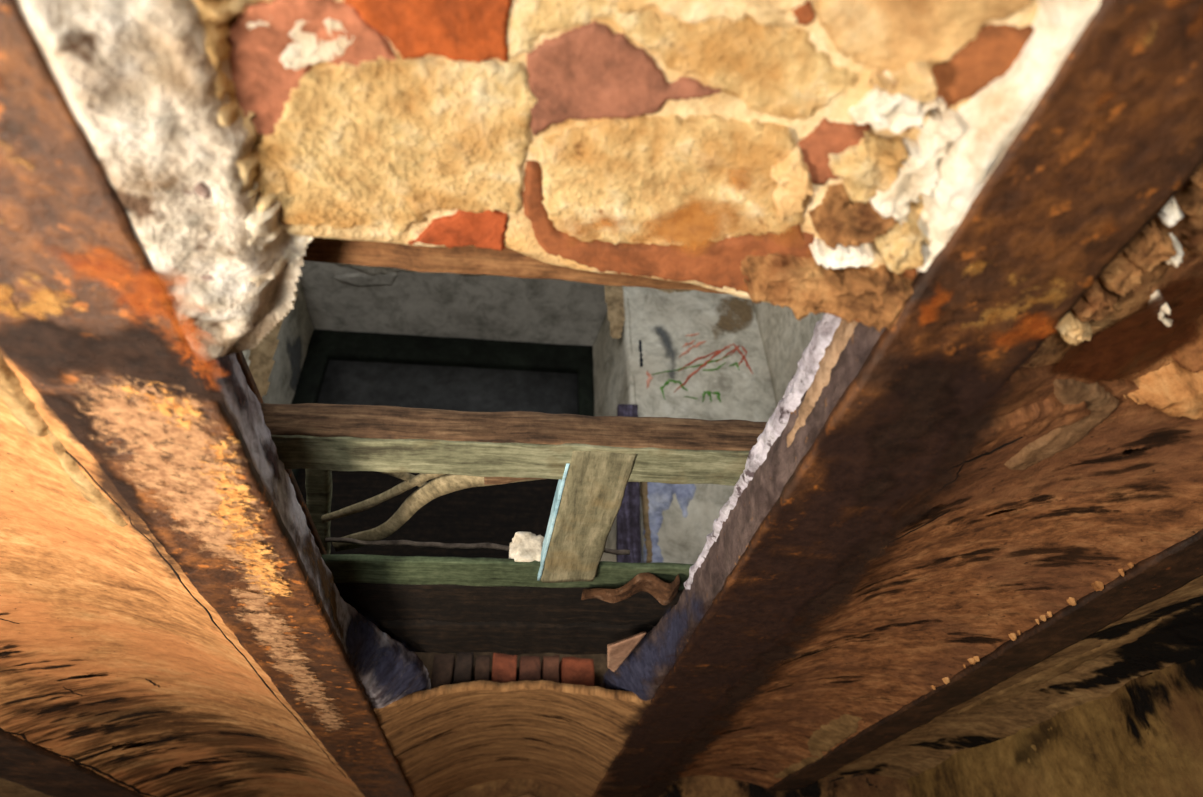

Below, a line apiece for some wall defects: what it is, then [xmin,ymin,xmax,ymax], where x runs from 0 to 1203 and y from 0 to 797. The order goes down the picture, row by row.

rust [0,278,70,319]
rust [69,250,210,379]
rust [983,279,1066,345]
peeling [971,315,1203,470]